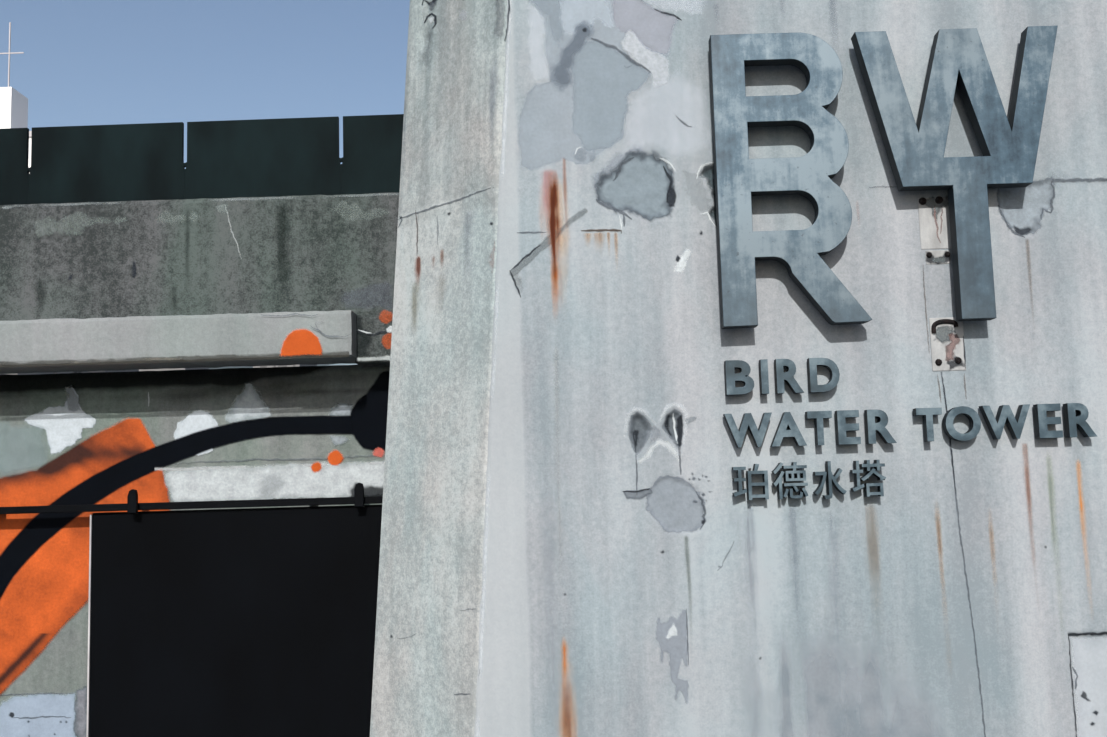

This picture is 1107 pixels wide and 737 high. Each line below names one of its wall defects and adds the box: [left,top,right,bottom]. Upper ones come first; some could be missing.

crack [422,0,437,28]
peeling [519,0,681,169]
crack [397,187,494,227]
spalling [509,209,587,297]
rust [549,165,566,281]
spalling [596,151,676,230]
spalling [676,250,691,272]
spalling [997,177,1055,238]
spalling [623,410,707,532]
peeling [656,610,689,703]